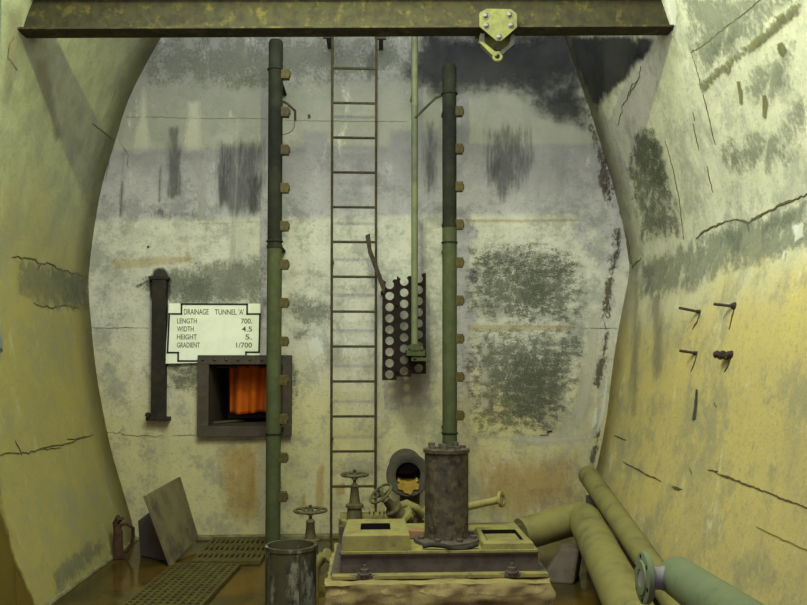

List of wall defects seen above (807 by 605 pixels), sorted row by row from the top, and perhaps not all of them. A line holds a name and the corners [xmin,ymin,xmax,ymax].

leakage [683,0,783,62]
mould [745,62,782,98]
mould [723,102,803,172]
mould [629,129,679,239]
crack [665,141,807,240]
mould [640,201,807,294]
leakage [467,244,598,444]
rust [713,350,731,372]
crack [1,432,184,455]
crack [624,462,807,508]
leakage [0,514,34,605]